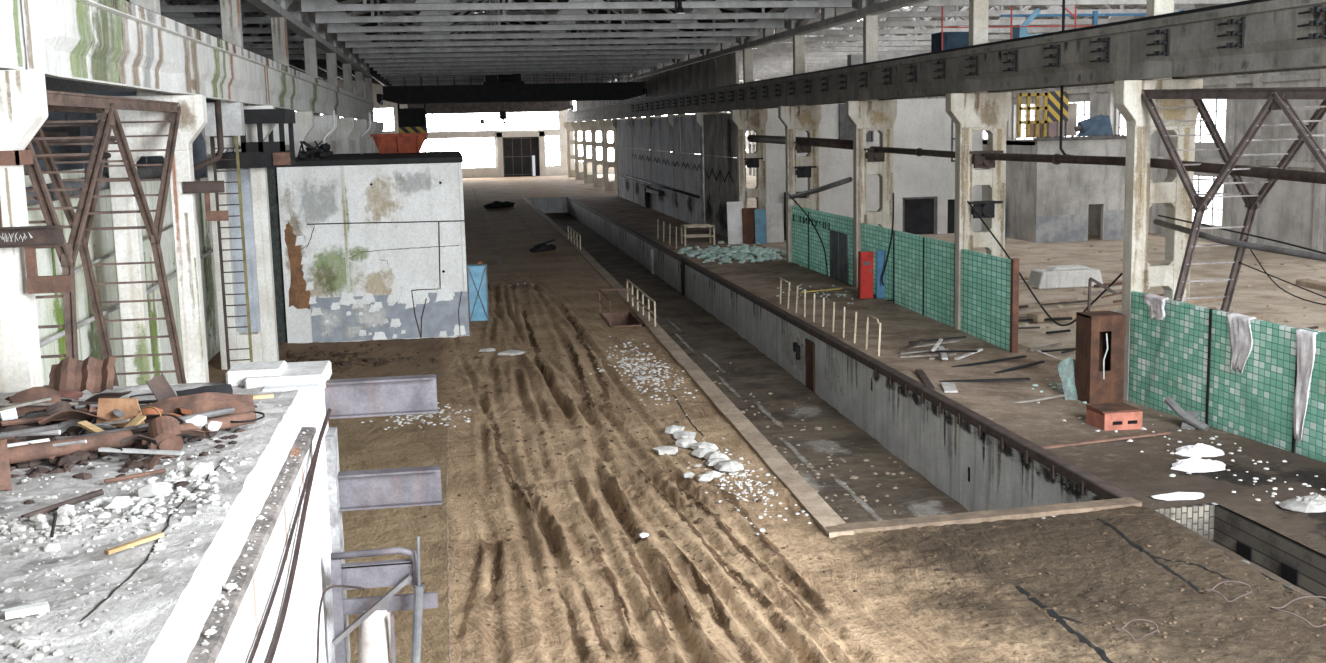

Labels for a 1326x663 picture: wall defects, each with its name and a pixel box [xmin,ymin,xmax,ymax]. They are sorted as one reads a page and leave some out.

damp [71,0,165,89]
peeling [283,213,455,340]
peeling [439,324,466,337]
crack [1097,519,1232,594]
crack [1016,585,1113,663]